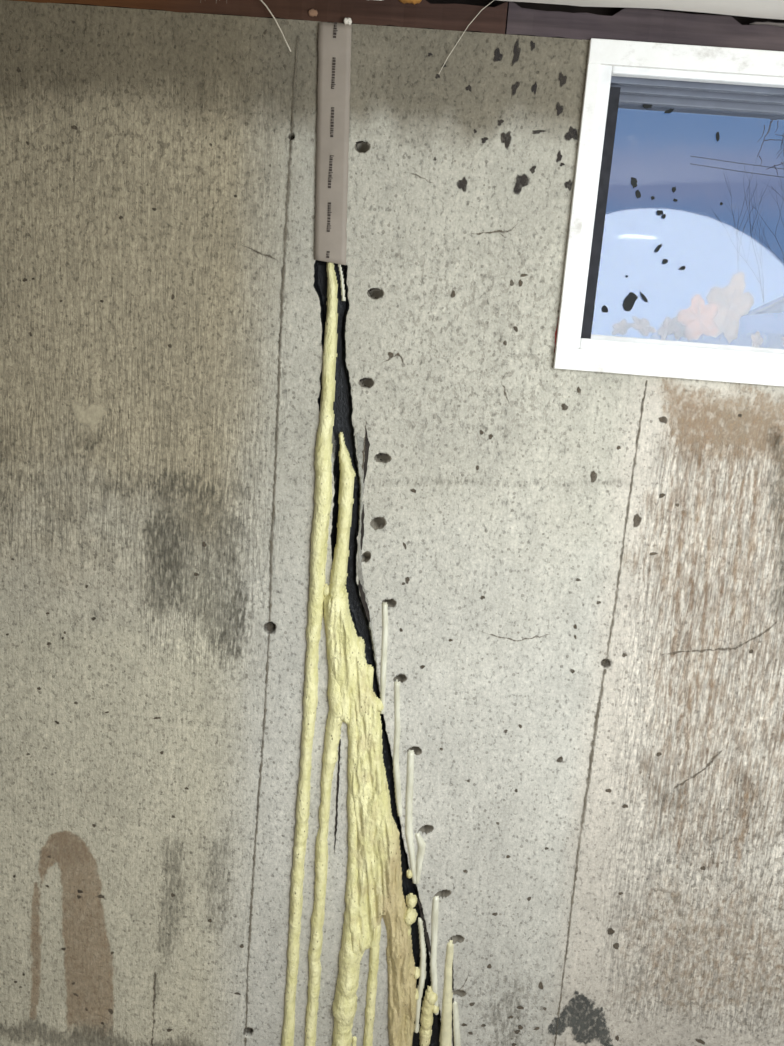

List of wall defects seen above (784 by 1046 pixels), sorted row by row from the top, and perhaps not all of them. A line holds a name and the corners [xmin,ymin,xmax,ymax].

crack [313,260,467,1046]
leakage [0,833,127,1046]
leakage [548,991,613,1046]